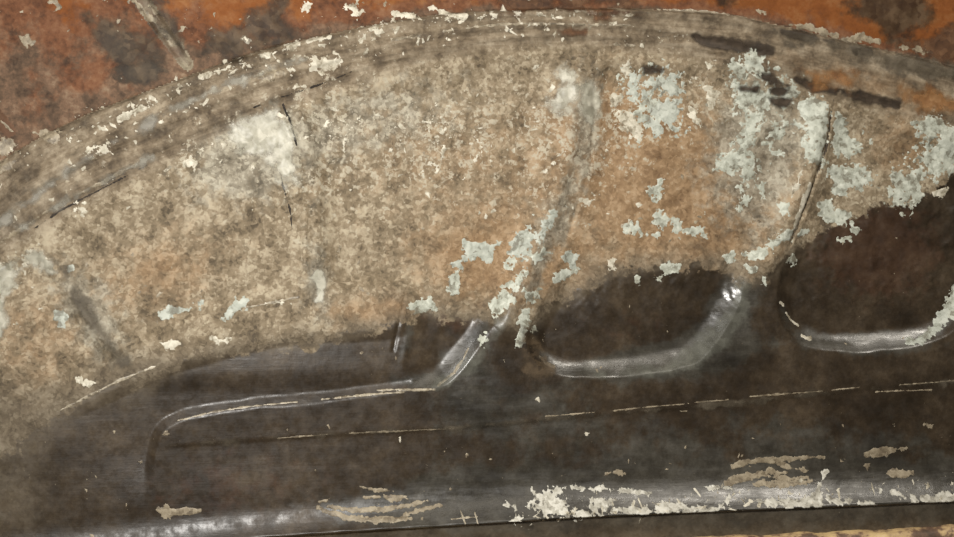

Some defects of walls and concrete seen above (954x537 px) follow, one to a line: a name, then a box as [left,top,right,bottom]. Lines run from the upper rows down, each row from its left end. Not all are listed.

corrosion [503,0,629,21]
corrosion [691,33,775,56]
water stain [551,69,601,124]
corrosion [643,66,664,74]
corrosion [739,70,954,113]
crack [791,111,832,244]
crack [281,177,292,226]
corrosion [71,290,129,366]
water stain [321,348,469,400]
water stain [177,401,298,421]
water stain [724,455,825,490]
water stain [316,486,443,525]